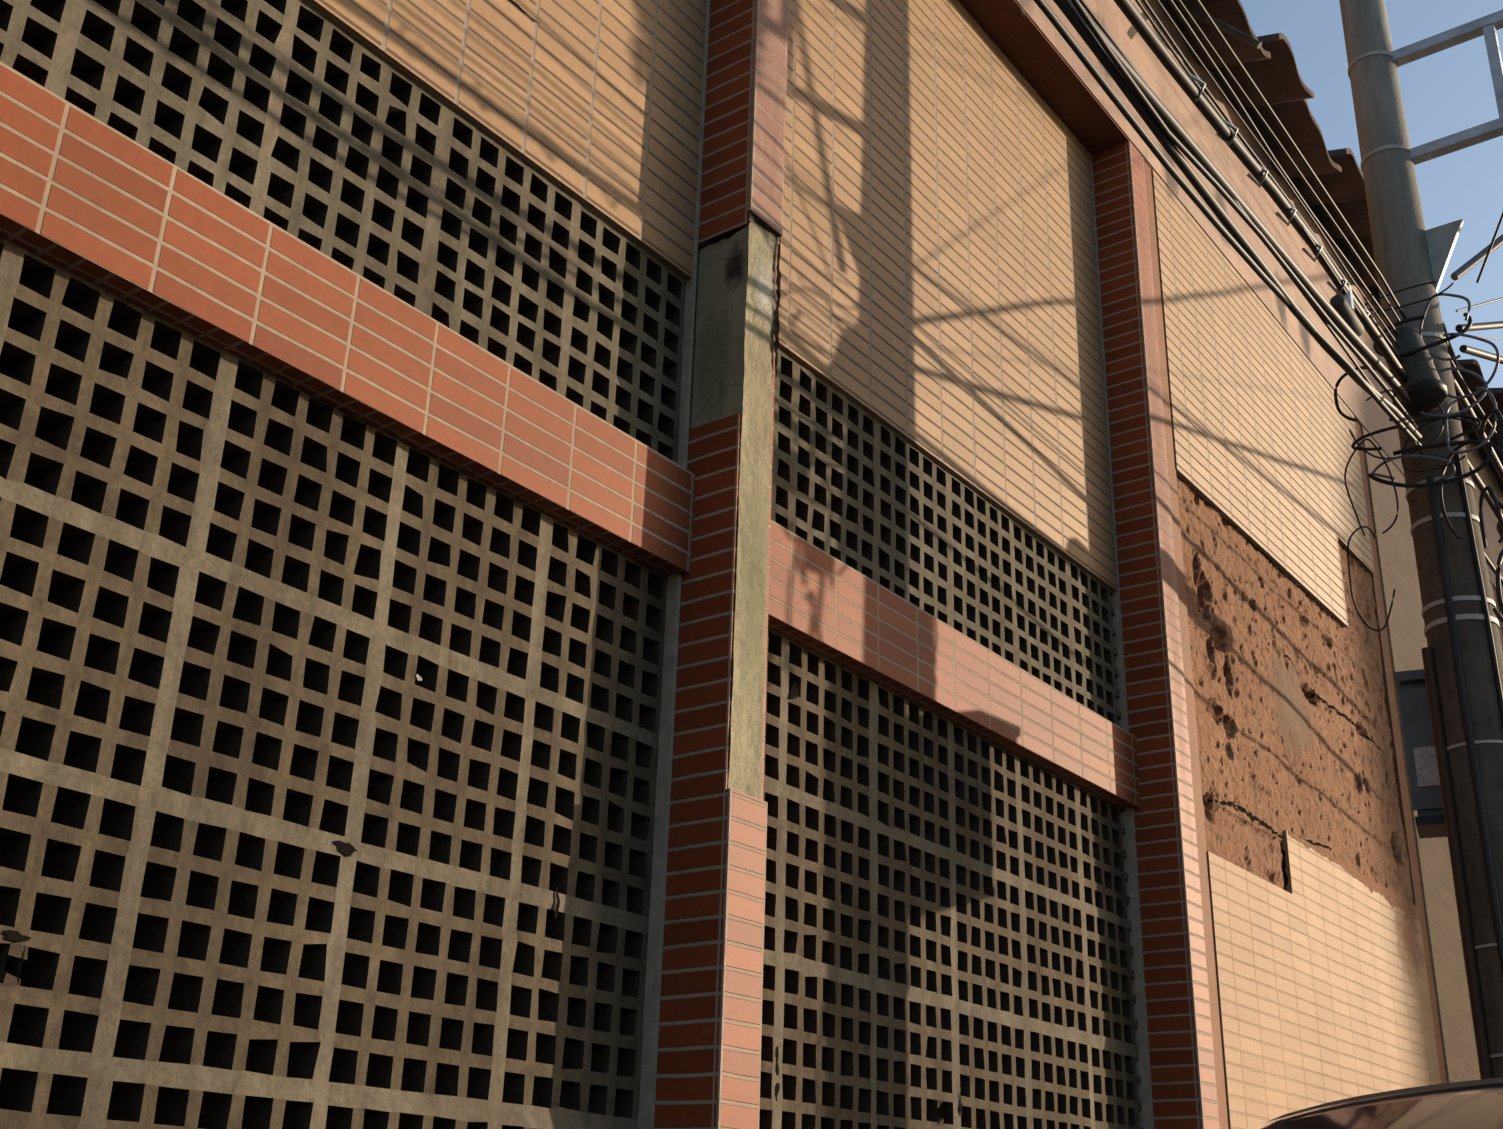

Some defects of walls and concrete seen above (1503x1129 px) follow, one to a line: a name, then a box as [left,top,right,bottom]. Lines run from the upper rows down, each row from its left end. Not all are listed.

crack [1206,799,1332,890]
peeling [1176,471,1419,922]